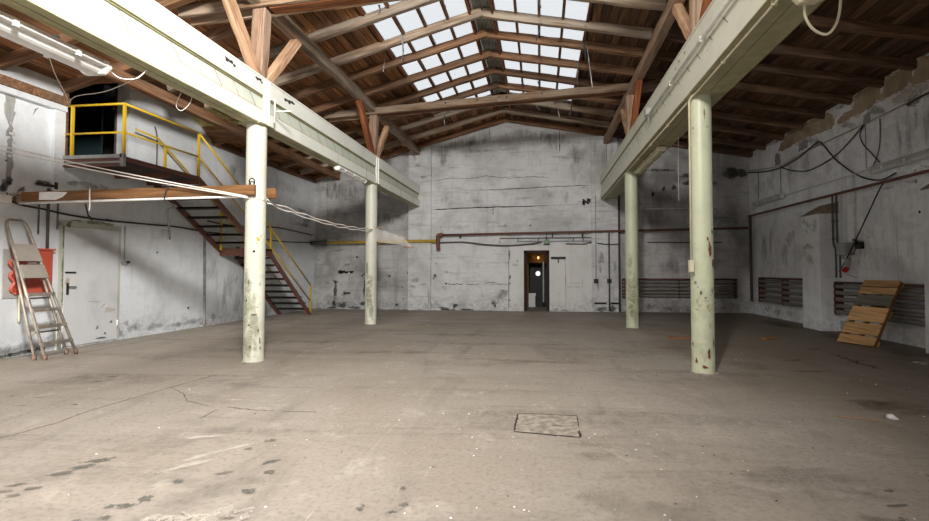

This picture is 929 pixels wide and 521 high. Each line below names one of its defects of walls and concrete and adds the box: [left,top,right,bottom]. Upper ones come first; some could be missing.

flaking render [776,55,929,166]
damp [0,177,25,192]
crack [0,375,310,438]